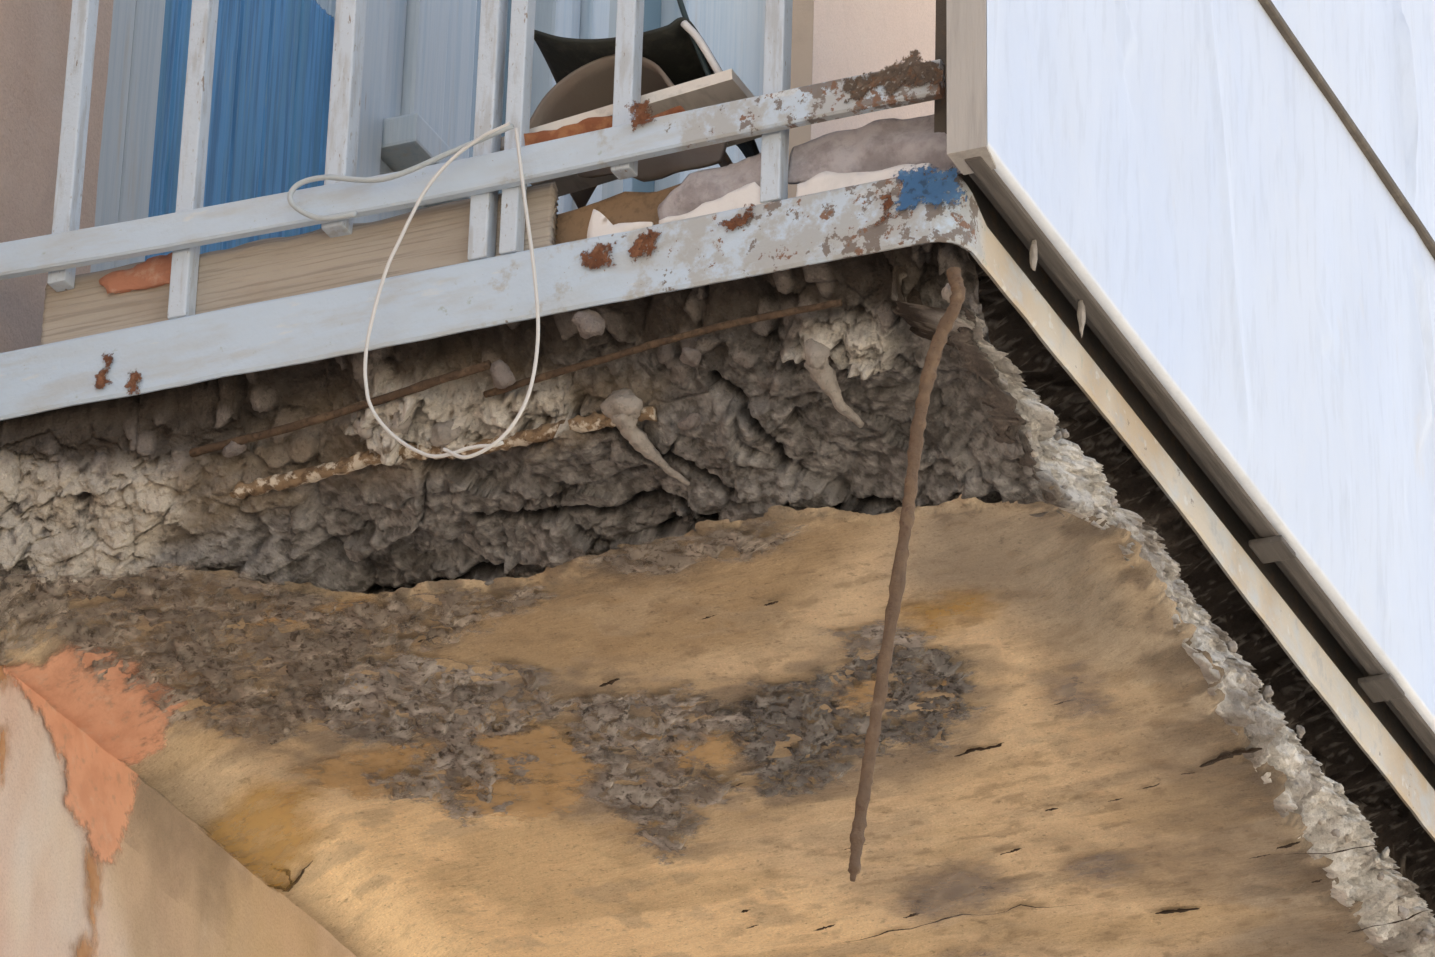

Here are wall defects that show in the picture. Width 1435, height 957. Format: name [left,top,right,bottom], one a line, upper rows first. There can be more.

rust [842,49,943,103]
rust [524,99,685,146]
rust [717,204,755,232]
rust [875,193,899,226]
rust [580,227,662,269]
rust [94,353,142,395]
spalling [0,242,1435,957]